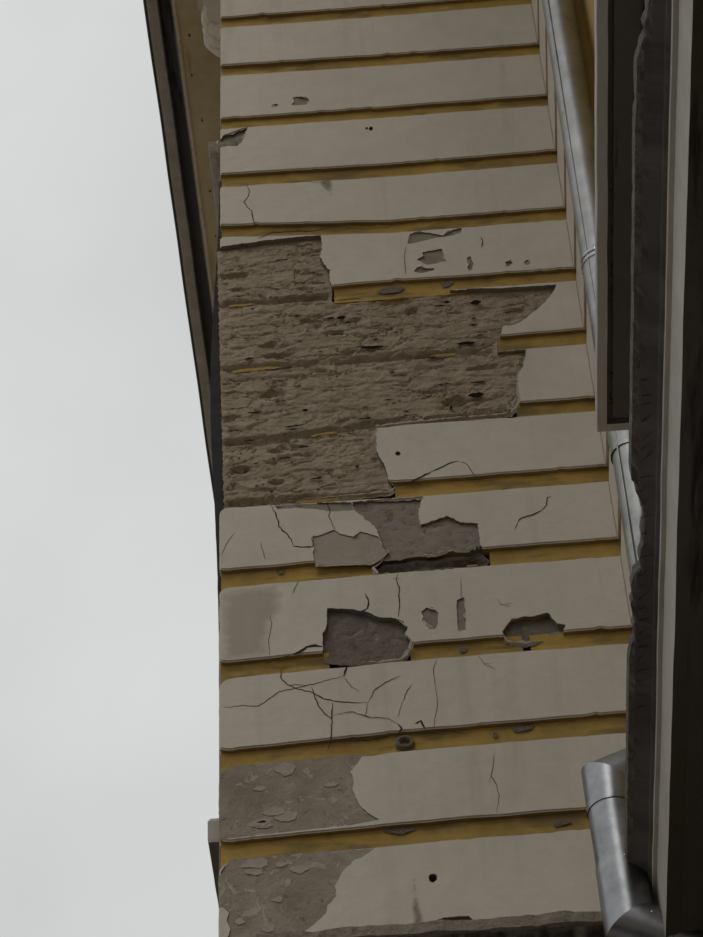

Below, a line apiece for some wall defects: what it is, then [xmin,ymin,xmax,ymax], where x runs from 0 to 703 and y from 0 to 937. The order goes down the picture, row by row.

peeling [408,230,461,244]
spalling [217,241,554,575]
crack [271,506,314,547]
spalling [323,613,414,666]
peeling [422,608,438,629]
spalling [502,613,564,648]
crack [232,619,465,751]
peeling [219,754,378,840]
peeling [218,848,374,937]